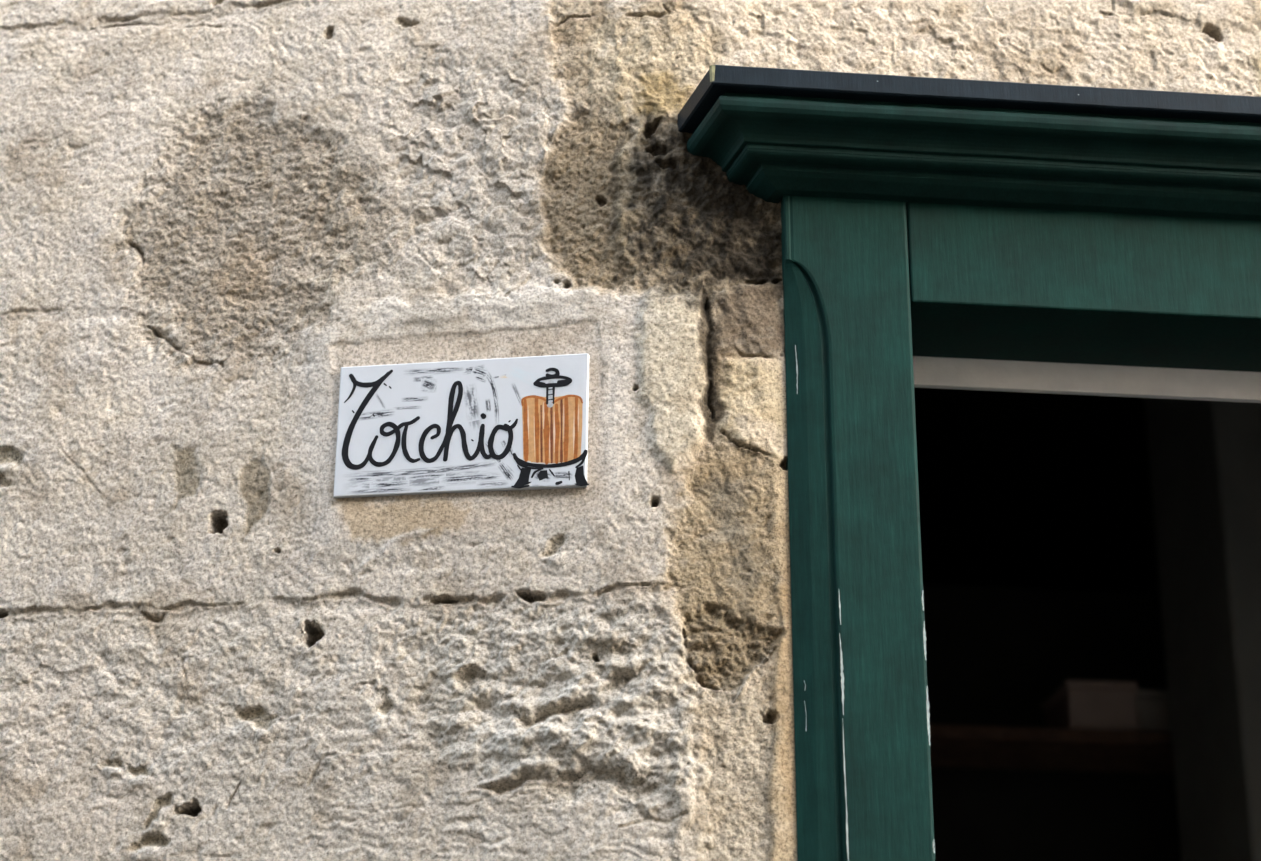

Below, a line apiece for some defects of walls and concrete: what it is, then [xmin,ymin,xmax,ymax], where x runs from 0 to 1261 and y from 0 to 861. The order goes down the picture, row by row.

damp [593,116,783,447]
damp [693,463,770,629]
spalling [368,592,774,828]